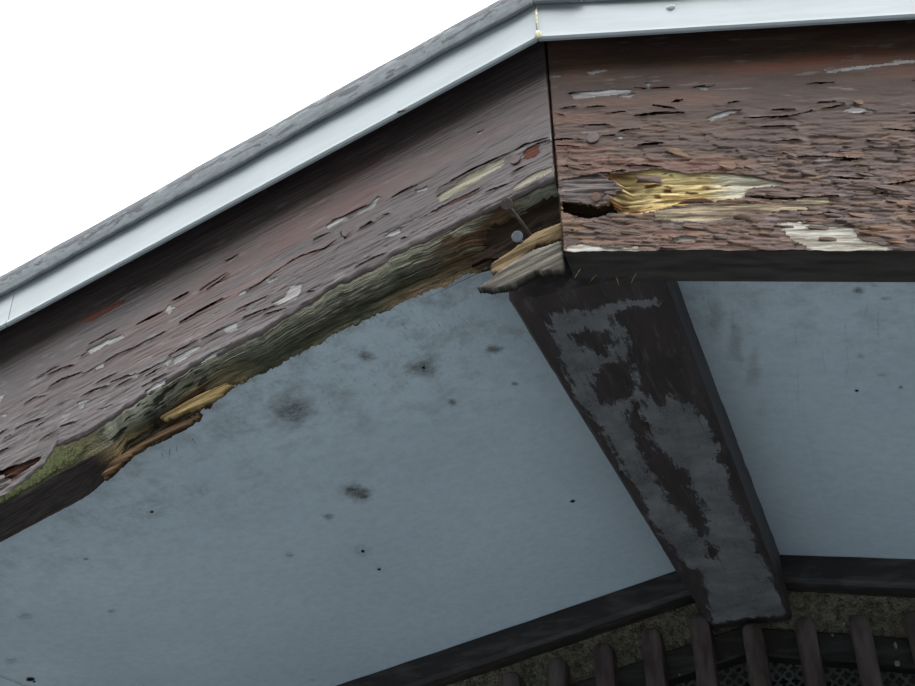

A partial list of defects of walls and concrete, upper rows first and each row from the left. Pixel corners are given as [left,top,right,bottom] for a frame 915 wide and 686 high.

peeling [824,60,915,73]
peeling [570,88,636,99]
peeling [412,158,506,222]
peeling [511,165,554,190]
peeling [717,151,915,221]
peeling [564,224,760,252]
peeling [774,200,908,251]
peeling [270,282,304,307]
peeling [85,334,124,355]
peeling [160,322,238,366]
peeling [0,457,41,480]
peeling [544,296,785,624]